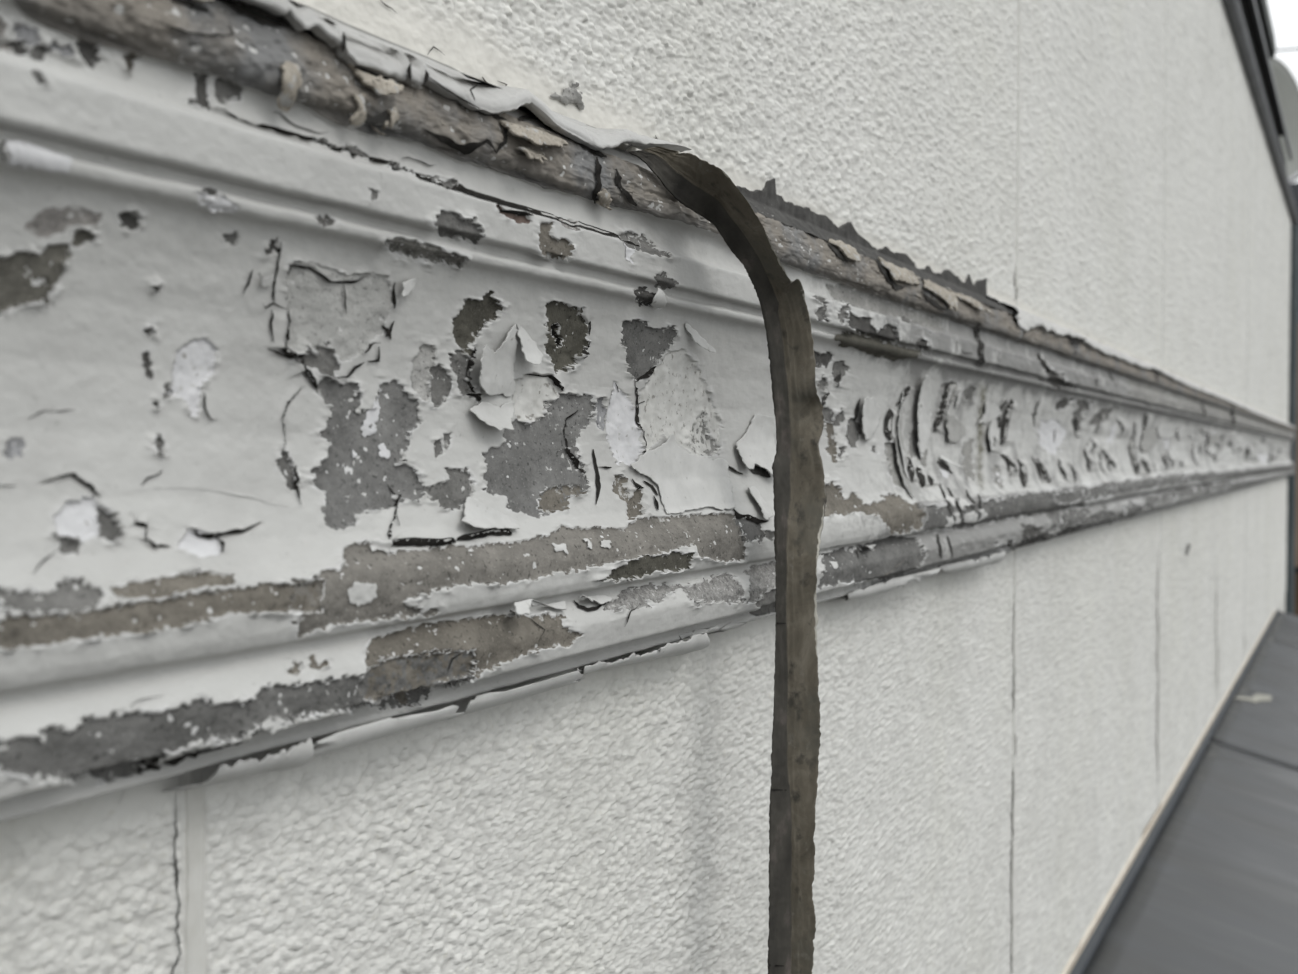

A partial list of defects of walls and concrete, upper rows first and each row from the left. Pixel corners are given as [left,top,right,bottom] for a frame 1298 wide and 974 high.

peeling [0,0,1021,974]
peeling [923,464,1293,550]
spalling [1016,326,1295,437]
crack [171,798,181,974]
crack [1010,580,1018,974]
crack [1141,549,1163,838]